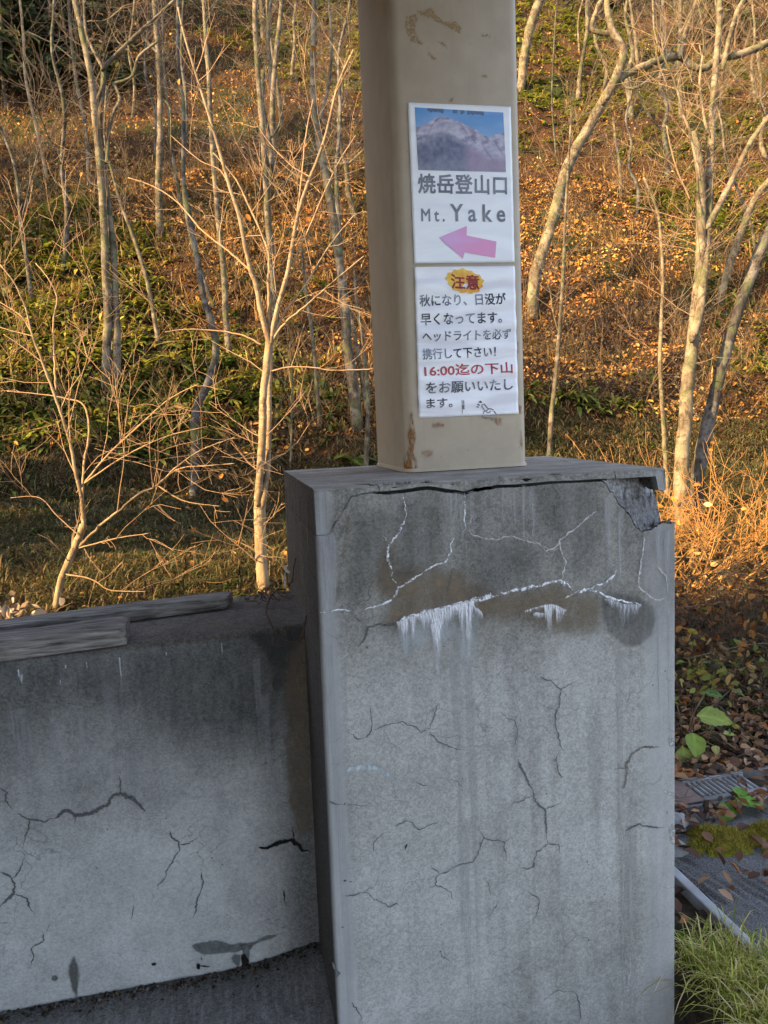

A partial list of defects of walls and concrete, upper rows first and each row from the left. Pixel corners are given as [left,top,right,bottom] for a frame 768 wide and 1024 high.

rust [404,414,416,473]
spalling [602,478,675,531]
crack [320,460,668,647]
leakage [382,556,593,649]
crack [337,705,463,750]
crack [429,662,576,922]
crack [617,746,653,789]
crack [259,830,310,852]
crack [626,823,663,831]
crack [0,776,145,967]
crack [131,832,204,922]
crack [349,877,401,908]